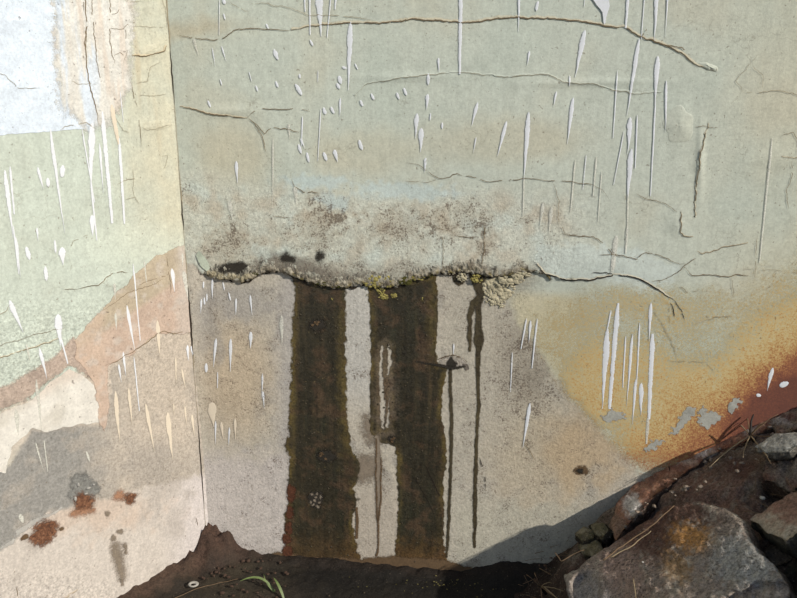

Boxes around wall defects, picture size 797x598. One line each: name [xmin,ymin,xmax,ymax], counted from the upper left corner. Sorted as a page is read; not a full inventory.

peeling [50,0,138,132]
spalling [67,473,101,518]
peeling [0,246,190,473]
damp [272,276,473,571]
spalling [196,251,550,308]
crack [63,0,712,525]
spalling [417,355,469,370]
damp [453,273,486,548]
crack [410,123,794,371]
corrosion [536,270,797,474]